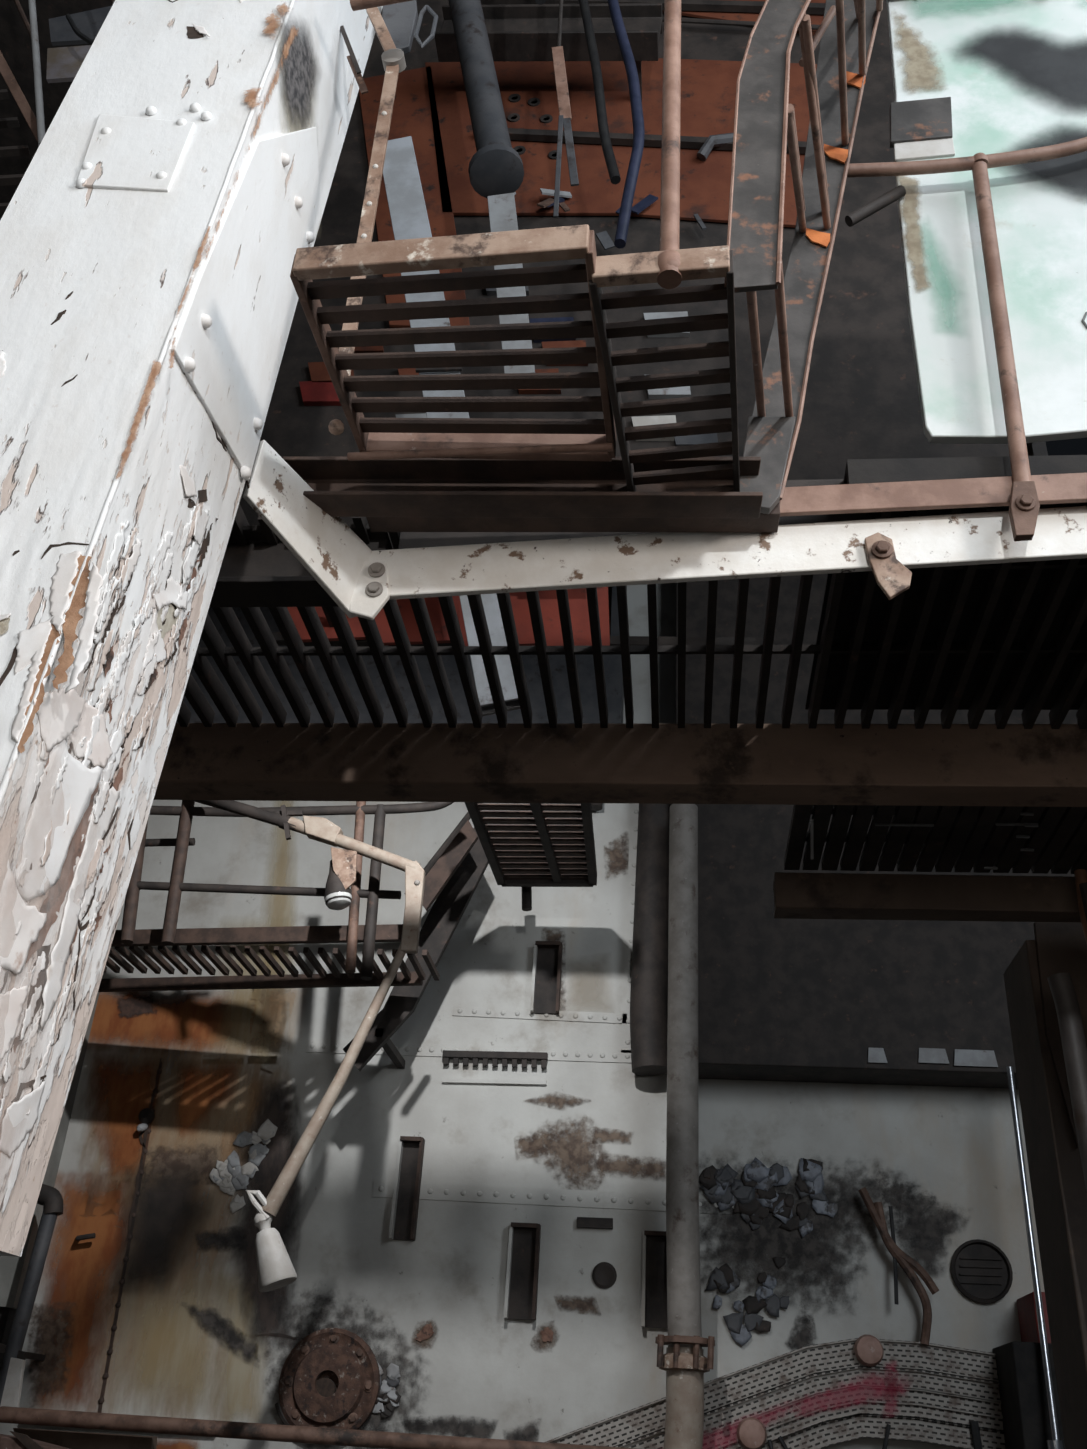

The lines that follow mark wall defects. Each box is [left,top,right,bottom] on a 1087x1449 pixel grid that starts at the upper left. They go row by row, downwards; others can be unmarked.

corrosion [244,4,298,150]
corrosion [116,175,238,478]
peeling [0,465,218,1118]
corrosion [29,991,296,1405]
corrosion [526,1095,583,1109]